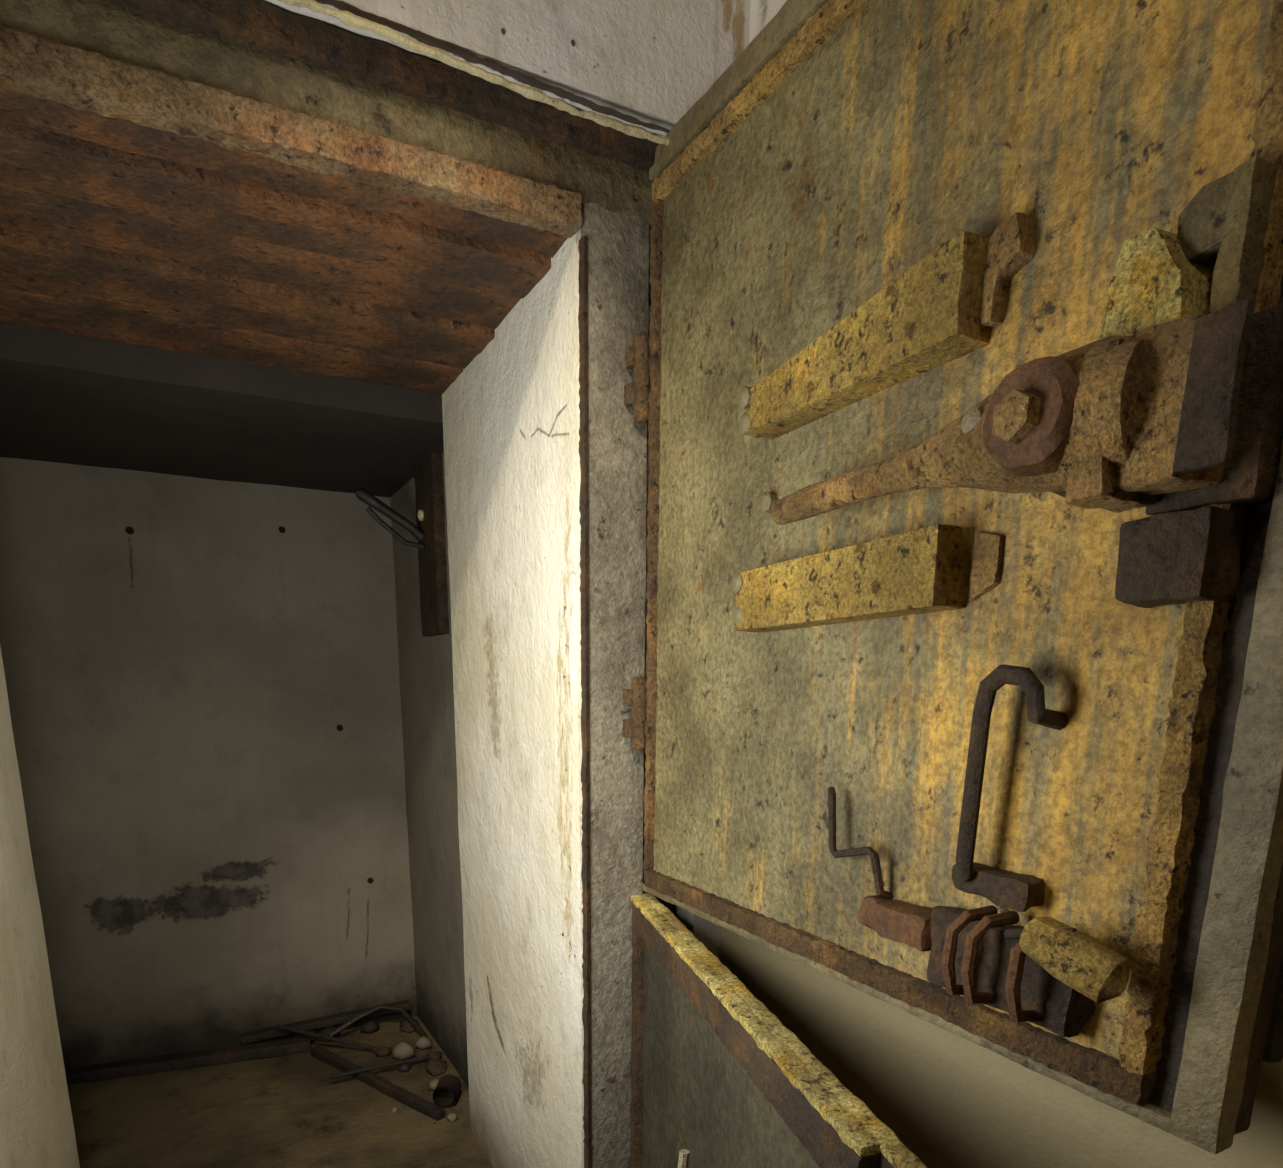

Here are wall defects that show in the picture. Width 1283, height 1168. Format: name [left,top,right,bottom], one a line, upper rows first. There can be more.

rust [723,0,744,61]
peeling [86,859,276,934]